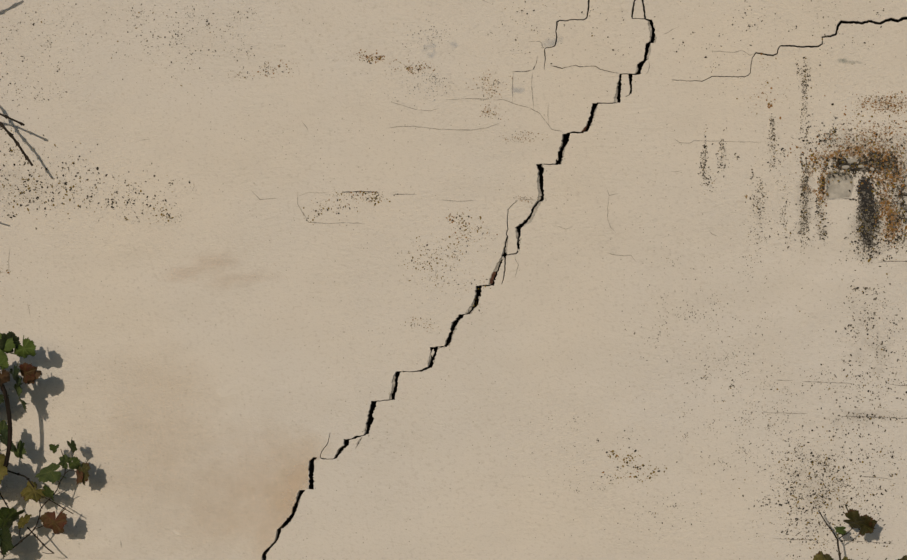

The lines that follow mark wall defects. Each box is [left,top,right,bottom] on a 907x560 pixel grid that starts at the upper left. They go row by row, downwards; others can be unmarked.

damp [0,4,118,119]
damp [102,1,261,78]
crack [676,17,907,82]
damp [0,124,191,230]
corrosion [783,91,907,260]
crack [262,0,671,560]
damp [649,56,907,560]